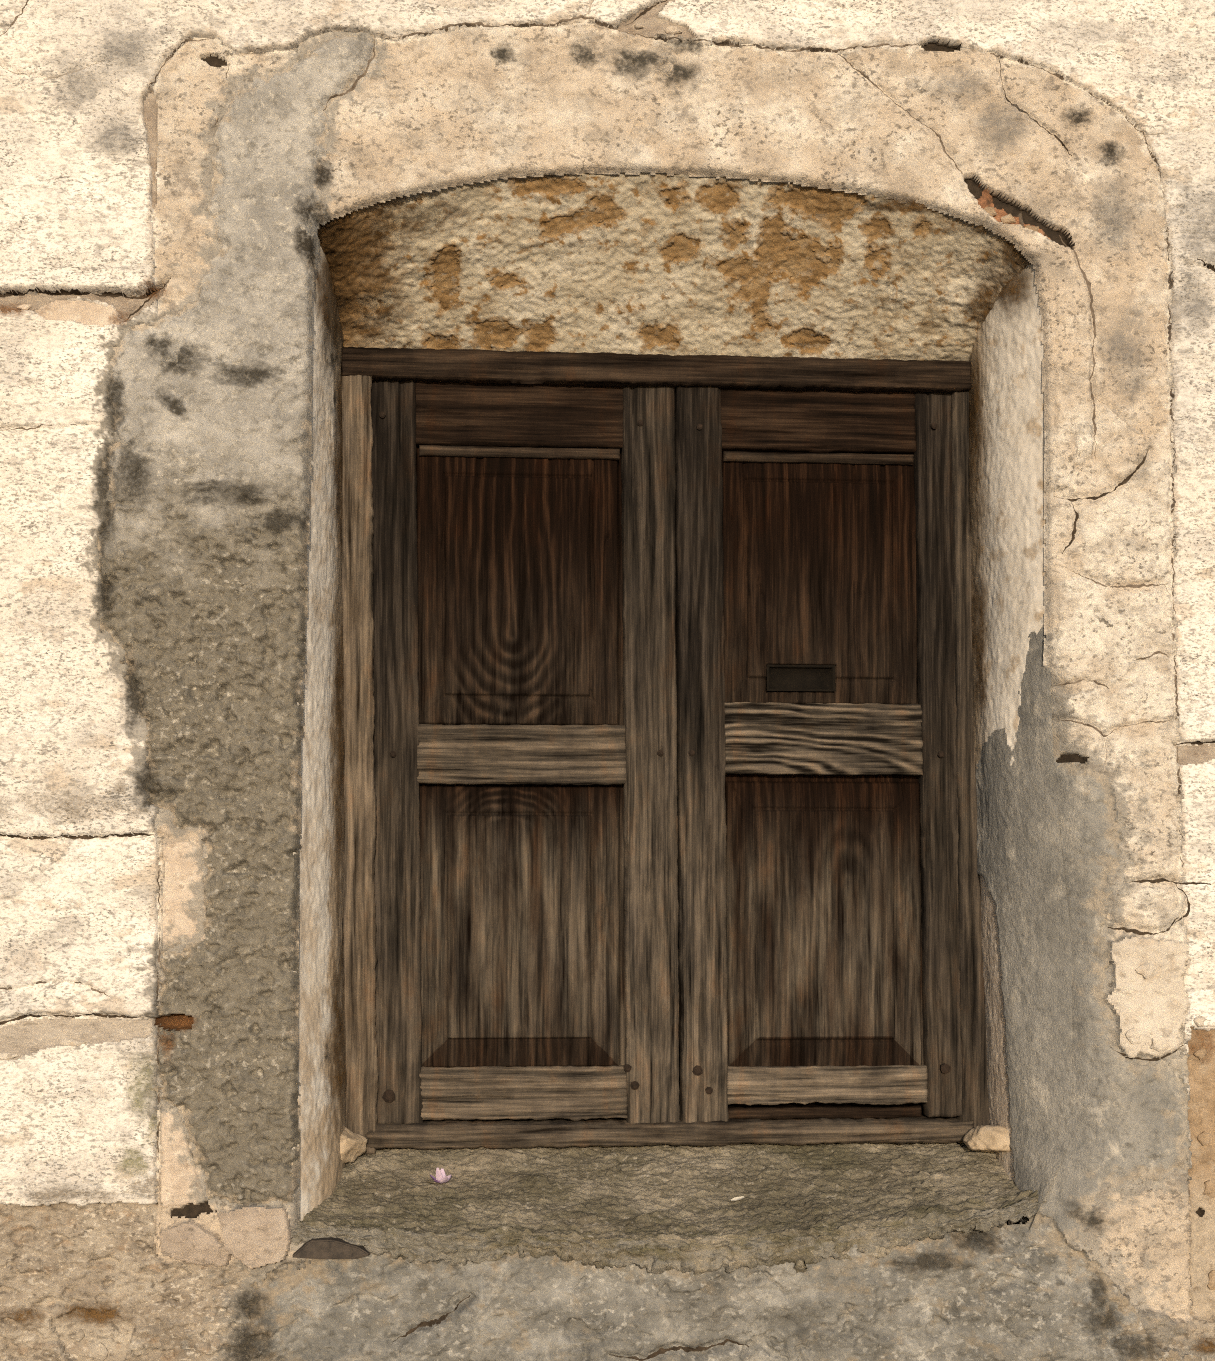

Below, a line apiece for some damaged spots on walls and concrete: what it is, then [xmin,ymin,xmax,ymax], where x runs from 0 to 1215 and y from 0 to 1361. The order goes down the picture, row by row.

crack [0,0,101,80]
flaking render [201,54,227,68]
crack [149,0,963,174]
peeling [432,245,462,311]
peeling [515,175,624,237]
peeling [659,183,893,332]
flaking render [964,175,1075,248]
crack [990,53,1215,351]
flaking render [1056,754,1090,764]
flaking render [161,839,206,951]
flaking render [980,875,1015,1182]
flaking render [160,1110,217,1218]